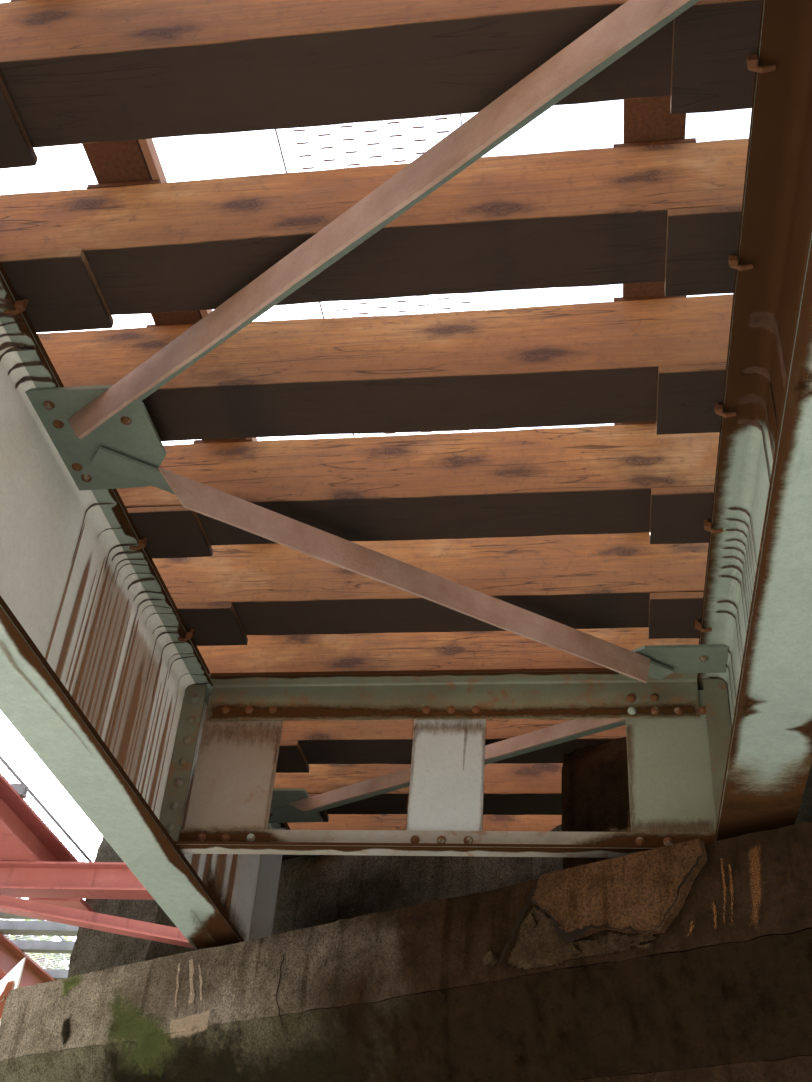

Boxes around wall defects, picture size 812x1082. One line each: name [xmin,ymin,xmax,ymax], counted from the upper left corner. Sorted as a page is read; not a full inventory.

rust [0,262,64,389]
rust [711,0,812,842]
rust [99,489,142,542]
rust [0,503,718,950]
peeling [482,838,708,970]
rust [713,860,733,926]
leakage [102,1027,354,1082]